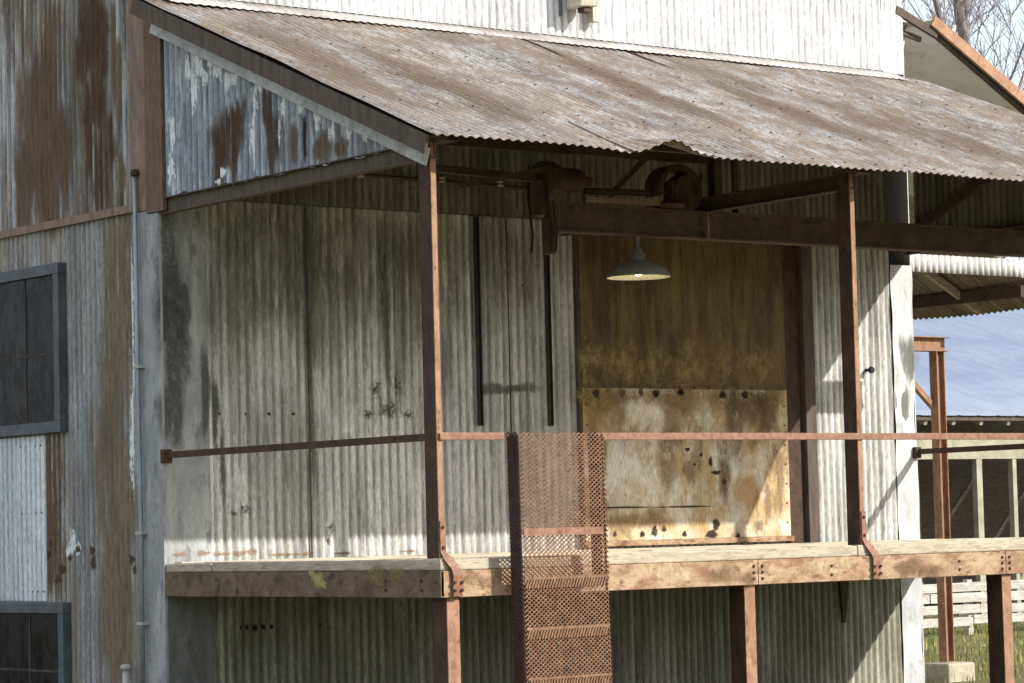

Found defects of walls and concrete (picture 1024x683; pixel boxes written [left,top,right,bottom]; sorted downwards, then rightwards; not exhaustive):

peeling [185,54,237,116]
peeling [167,110,176,187]
corrosion [209,99,245,187]
corrosion [262,89,297,178]
corrosion [313,131,348,161]
corrosion [16,0,136,677]
leakage [155,211,190,445]
corrosion [579,340,778,499]
corrosion [588,509,666,537]
corrosion [707,519,721,538]
corrosion [756,455,784,530]
corrosion [897,560,939,576]